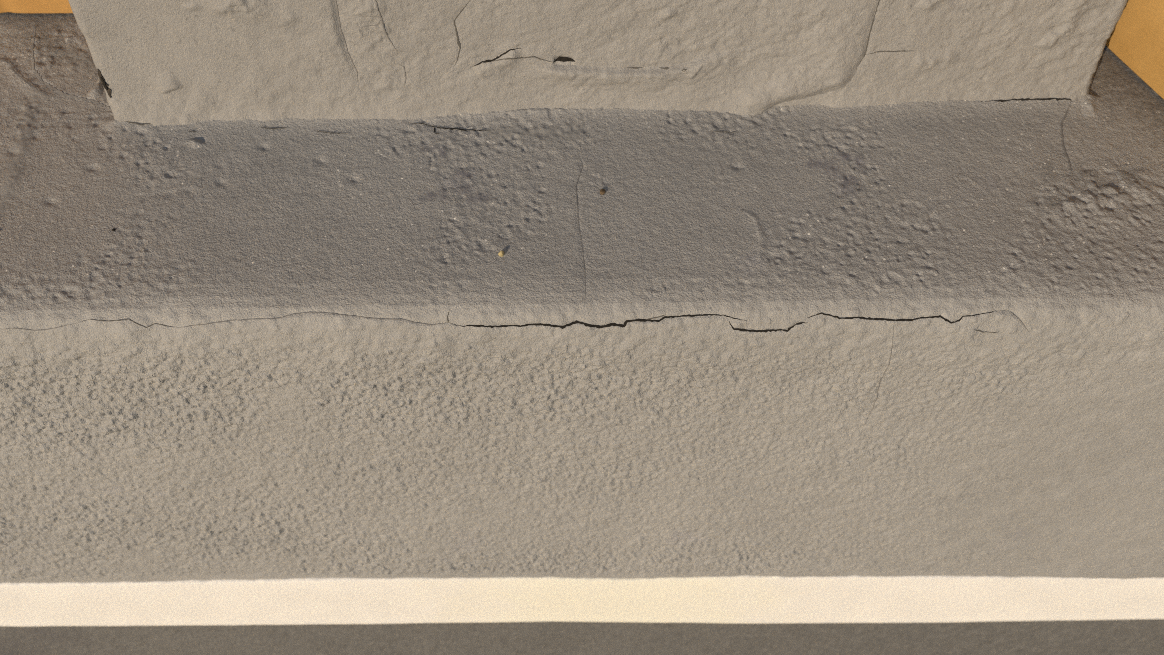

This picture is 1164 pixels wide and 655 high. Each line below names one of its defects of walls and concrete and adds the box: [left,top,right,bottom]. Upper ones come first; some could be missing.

crack [454,4,550,66]
crack [980,98,1073,177]
crack [2,156,1029,430]